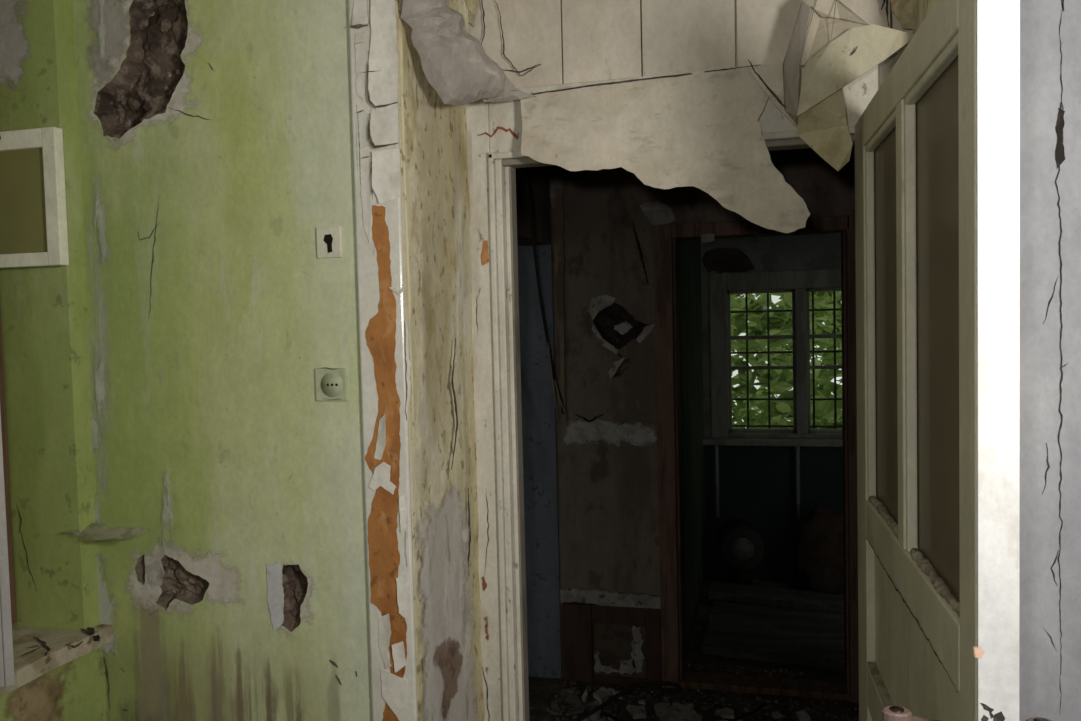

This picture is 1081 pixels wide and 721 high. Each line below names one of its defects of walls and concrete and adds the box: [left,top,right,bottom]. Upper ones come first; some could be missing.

spalling [87,0,202,149]
peeling [747,0,914,171]
peeling [88,180,109,452]
peeling [350,0,536,721]
spalling [588,295,655,378]
crack [1042,0,1067,708]
peeling [87,554,117,654]
spalling [126,471,241,615]
spalling [267,563,313,635]
peeling [594,625,645,675]